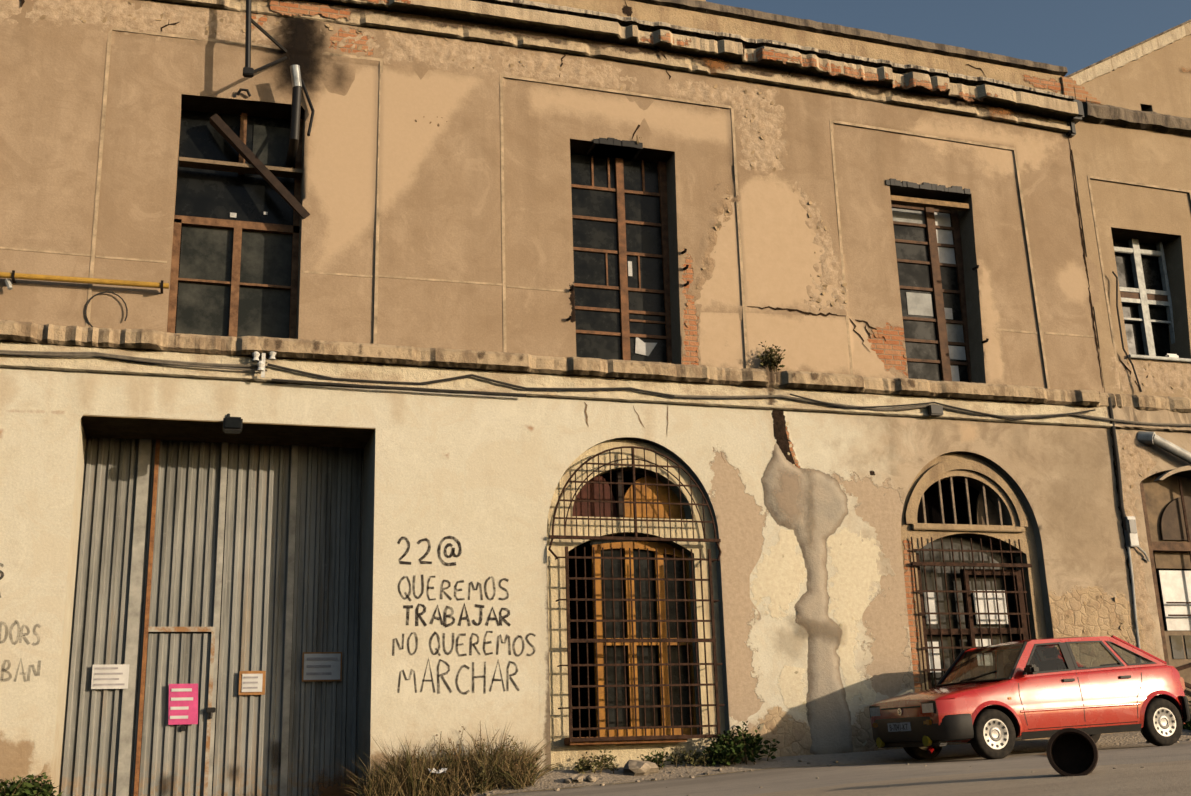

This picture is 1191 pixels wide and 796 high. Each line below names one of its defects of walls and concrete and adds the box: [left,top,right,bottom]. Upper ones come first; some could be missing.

damp [2,0,48,67]
damp [197,14,292,103]
flaking render [0,0,639,96]
damp [281,0,1049,199]
flaking render [660,69,856,365]
flaking render [867,317,908,378]
peeling [696,436,814,759]
damp [764,619,809,669]
peeling [822,457,922,752]
flaking render [1045,429,1165,667]